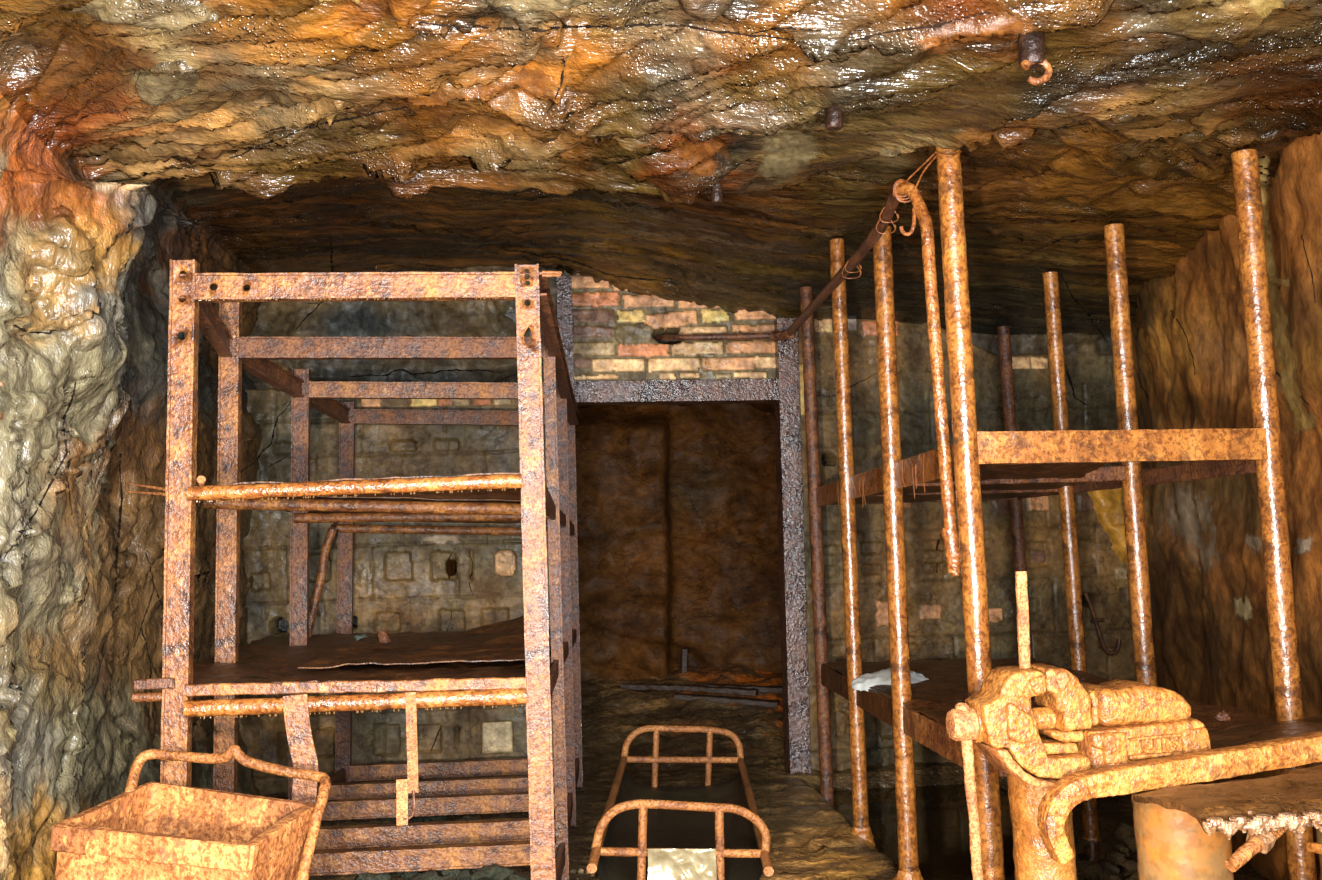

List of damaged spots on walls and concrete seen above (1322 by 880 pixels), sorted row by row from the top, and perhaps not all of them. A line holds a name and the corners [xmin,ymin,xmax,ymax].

crack [4,382,76,559]